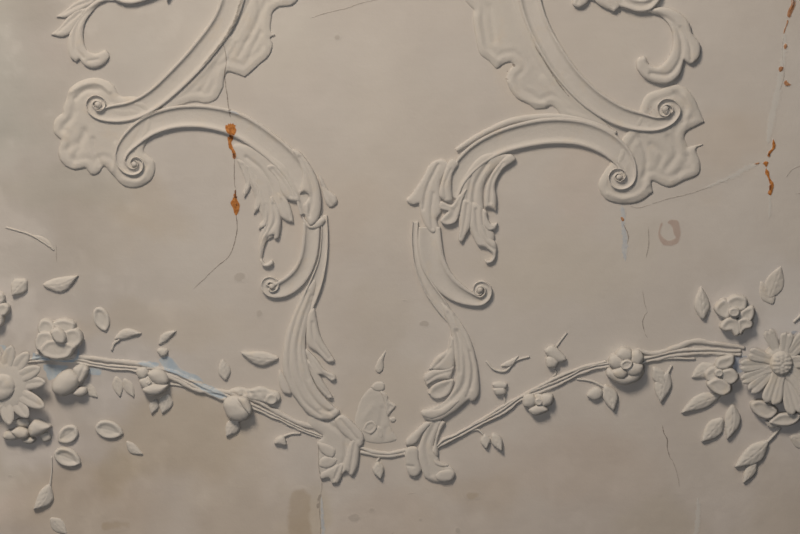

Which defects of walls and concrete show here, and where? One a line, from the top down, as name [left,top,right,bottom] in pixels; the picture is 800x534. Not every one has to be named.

corrosion [783,0,796,49]
corrosion [225,122,237,159]
corrosion [754,139,776,196]
corrosion [230,189,240,216]
crack [195,216,238,287]